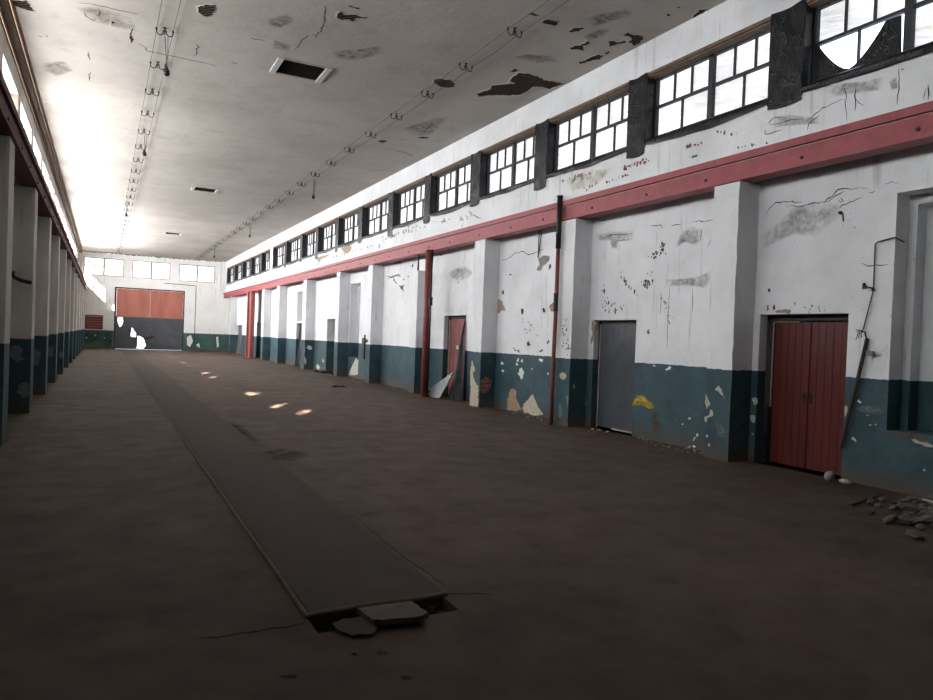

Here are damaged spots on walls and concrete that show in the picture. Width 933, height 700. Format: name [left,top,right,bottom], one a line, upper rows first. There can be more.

spalling [196,3,217,17]
spalling [335,6,370,22]
spalling [530,13,646,64]
spalling [474,68,566,97]
crack [768,88,862,134]
crack [766,181,894,214]
spalling [469,360,493,407]
spalling [507,387,544,416]
peeling [704,386,724,422]